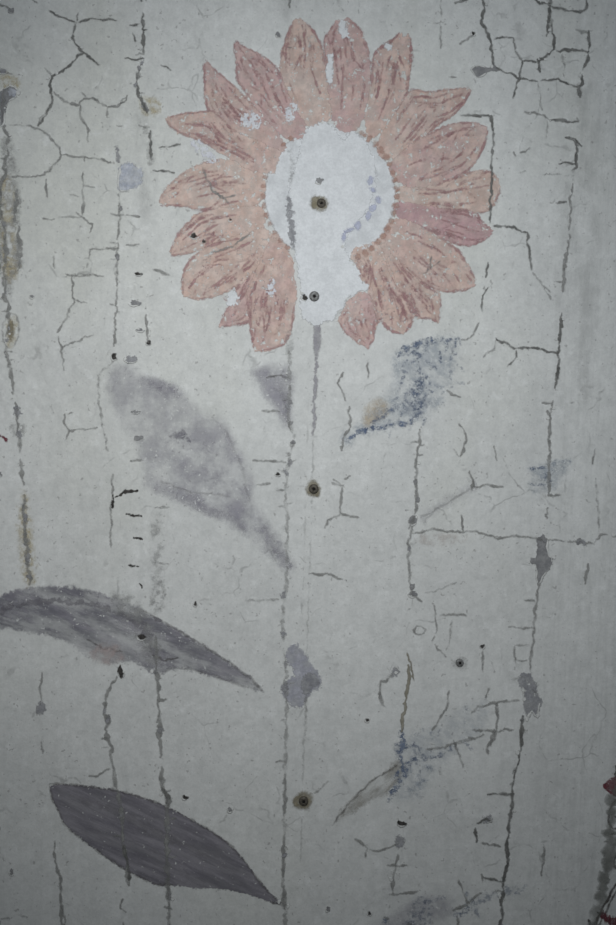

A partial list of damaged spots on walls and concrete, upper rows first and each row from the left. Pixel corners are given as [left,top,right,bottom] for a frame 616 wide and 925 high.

crack [0,0,180,585]
peeling [285,120,378,326]
crack [253,372,296,491]
crack [337,372,351,451]
crack [407,264,616,650]
crack [53,846,66,925]
crack [89,677,131,925]
crack [150,638,176,925]
crack [378,653,414,732]
crack [429,655,524,925]
crack [514,581,540,668]
crack [589,766,616,925]